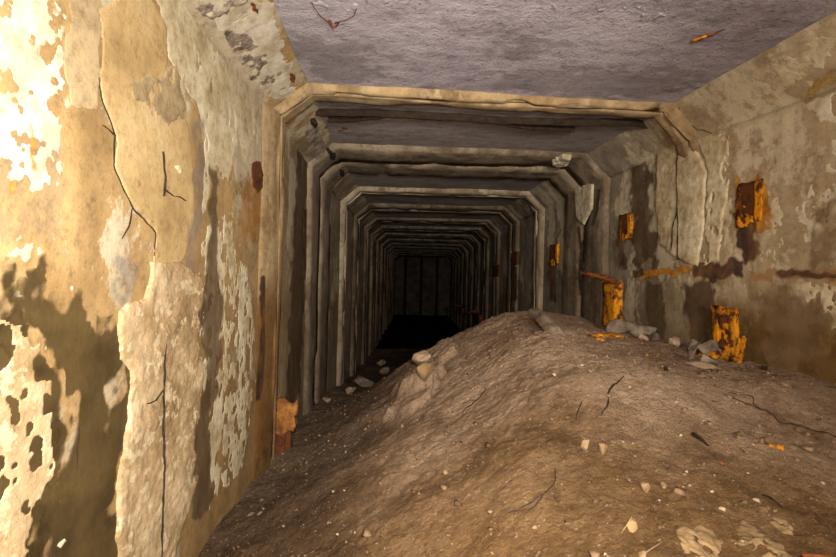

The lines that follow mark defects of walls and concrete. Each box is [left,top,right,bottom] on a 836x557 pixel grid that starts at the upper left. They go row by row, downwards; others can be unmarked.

peeling [742,36,836,123]
crack [99,77,157,256]
peeling [0,0,300,557]
crack [162,151,186,201]
peeling [574,184,594,225]
rust [615,174,771,283]
peeling [655,133,733,266]
rust [734,336,746,363]
peeling [795,281,836,330]
damp [0,256,130,557]
crack [148,345,167,557]
rust [276,397,300,436]